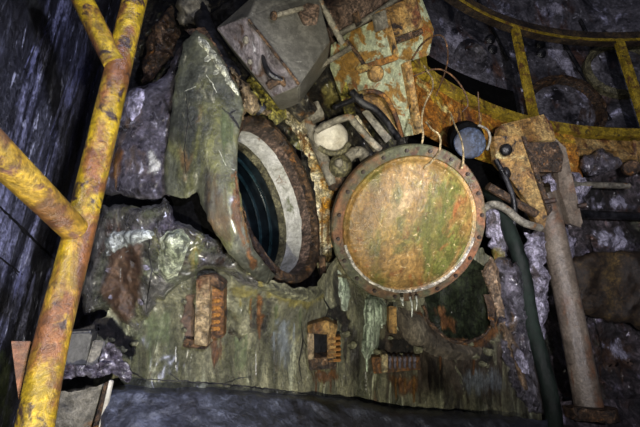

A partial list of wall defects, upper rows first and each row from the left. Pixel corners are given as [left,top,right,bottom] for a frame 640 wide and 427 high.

rust [210,286,227,366]